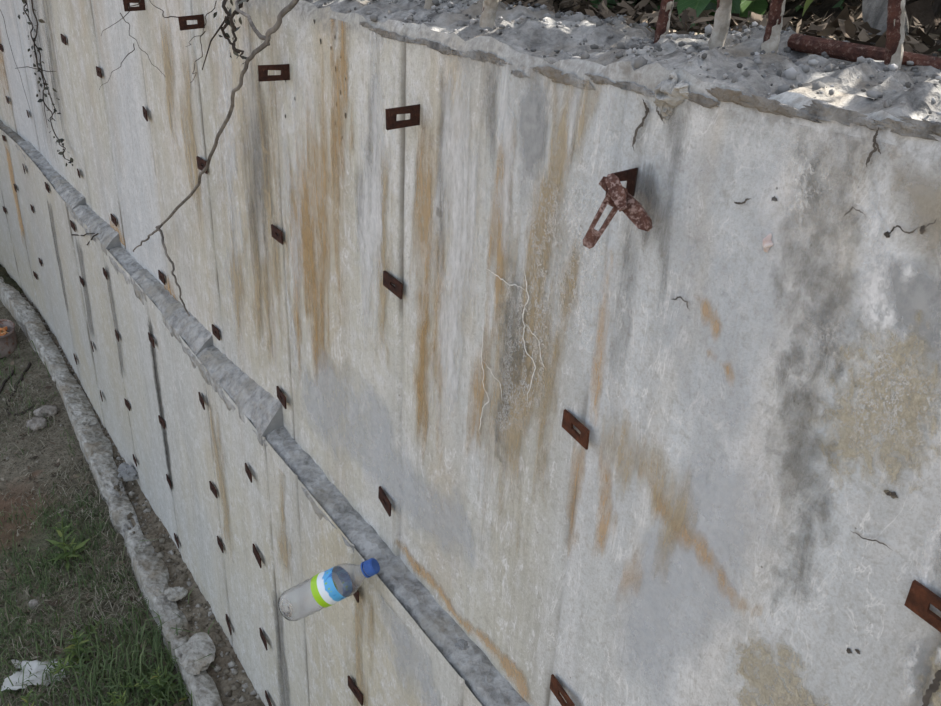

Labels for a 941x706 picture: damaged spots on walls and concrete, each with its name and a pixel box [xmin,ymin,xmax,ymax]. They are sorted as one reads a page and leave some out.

spalling [360,22,941,141]
corrosion [290,141,336,365]
corrosion [378,168,387,327]
corrosion [474,100,585,477]
damp [786,218,941,490]